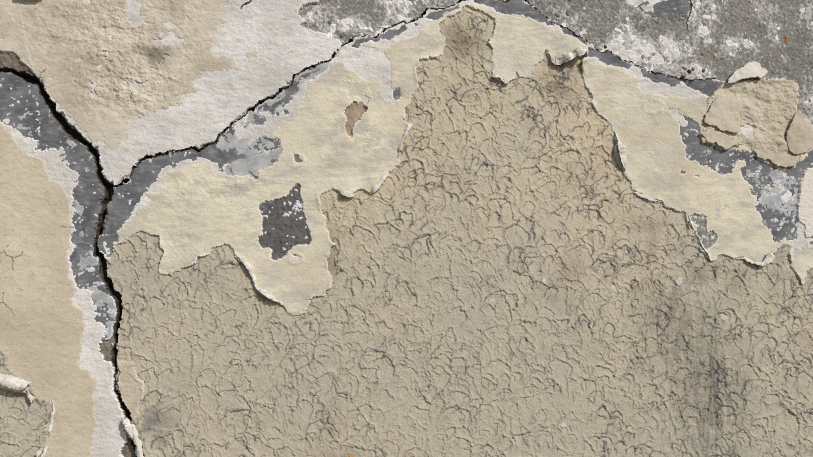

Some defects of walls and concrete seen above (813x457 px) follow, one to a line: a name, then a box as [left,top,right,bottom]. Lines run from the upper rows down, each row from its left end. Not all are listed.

peeling [0,72,145,457]
crack [0,0,466,455]
peeling [0,0,813,316]
crack [500,0,716,84]